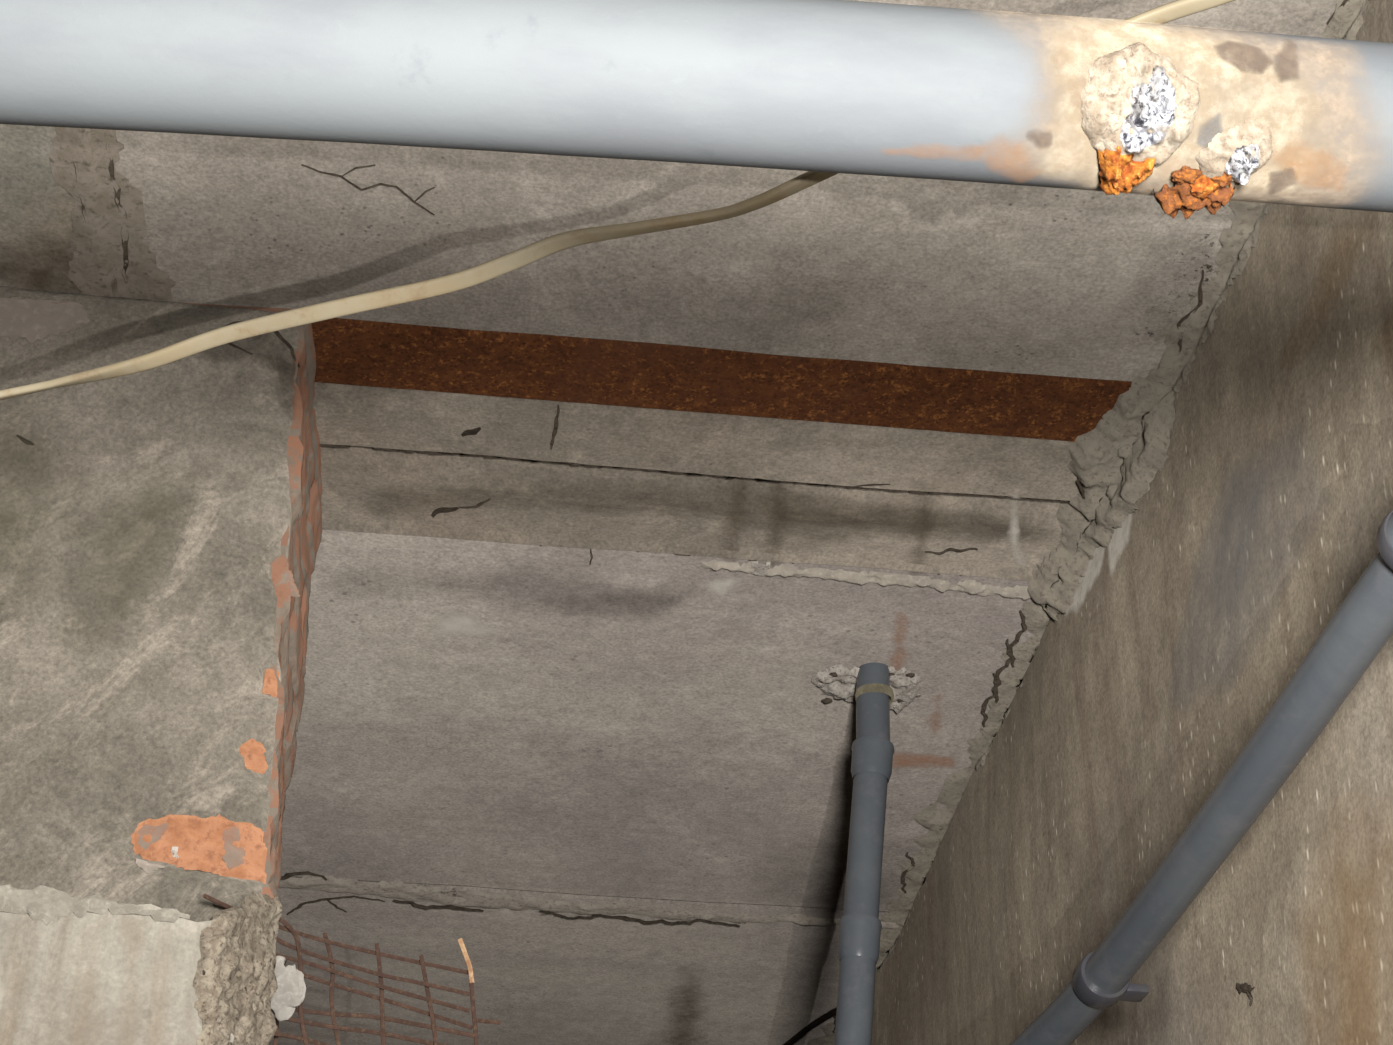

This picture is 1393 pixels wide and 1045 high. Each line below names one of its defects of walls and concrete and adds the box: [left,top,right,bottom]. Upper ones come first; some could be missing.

peeling [0,297,90,343]
crack [225,321,300,367]
crack [286,896,385,915]
spalling [131,814,302,1045]